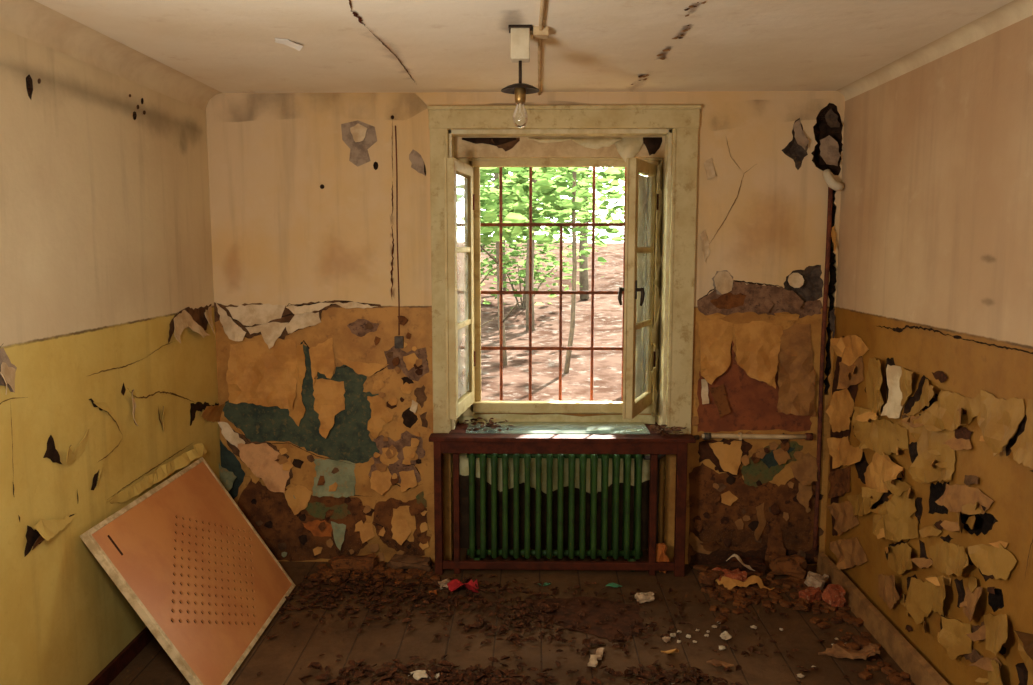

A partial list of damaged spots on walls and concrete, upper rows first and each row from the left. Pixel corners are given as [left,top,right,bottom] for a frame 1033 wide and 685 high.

crack [349,0,414,81]
spalling [341,120,378,170]
spalling [782,103,843,175]
peeling [0,344,17,393]
peeling [43,429,89,464]
peeling [168,300,431,562]
peeling [688,190,1033,685]
peeling [91,471,102,490]
peeling [24,514,78,557]